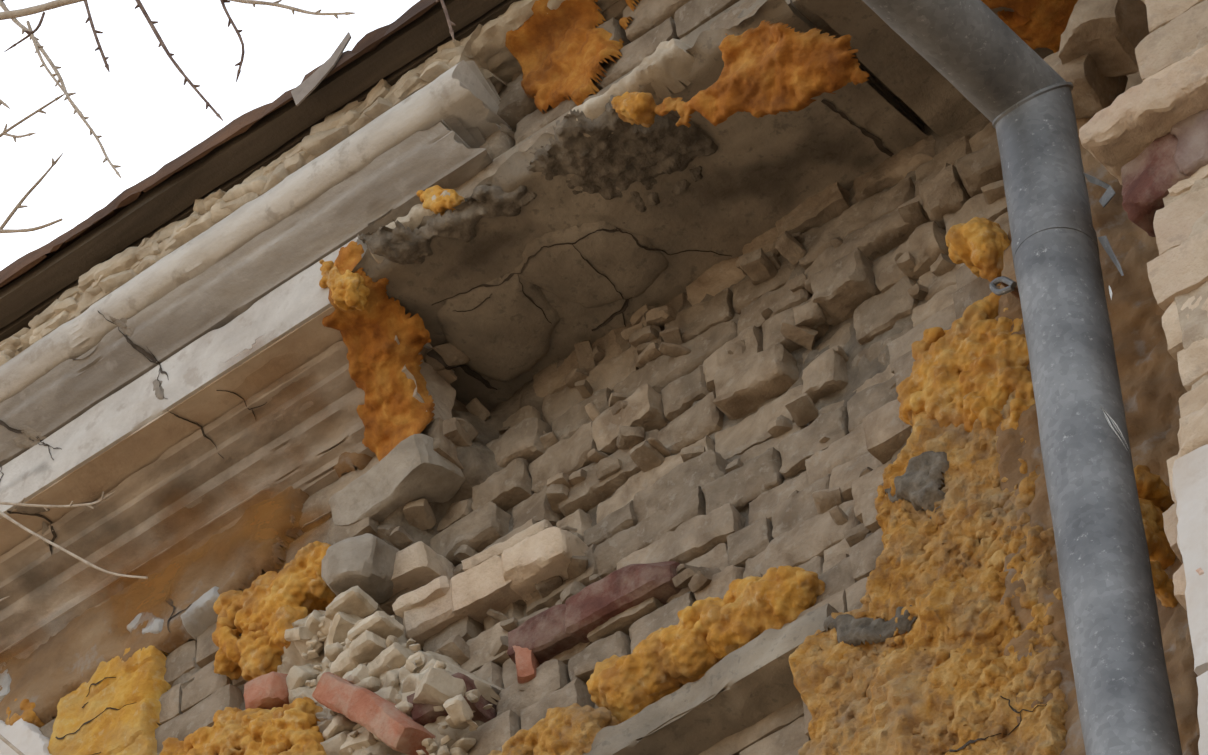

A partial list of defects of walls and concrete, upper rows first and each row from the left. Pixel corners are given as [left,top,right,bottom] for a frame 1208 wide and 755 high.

spalling [527,95,718,212]
spalling [357,184,537,265]
crack [432,227,731,331]
crack [98,311,223,458]
crack [216,390,267,420]
crack [0,420,62,481]
crack [7,506,57,554]